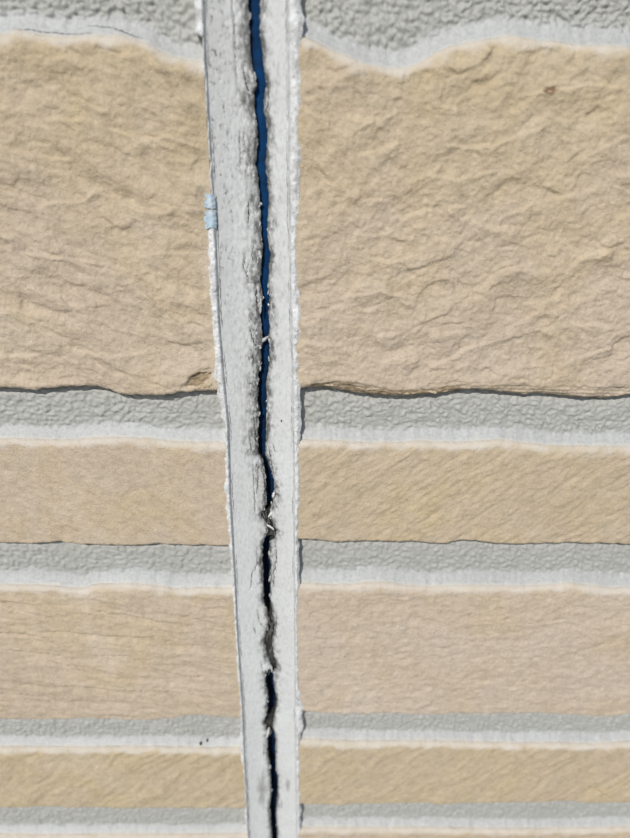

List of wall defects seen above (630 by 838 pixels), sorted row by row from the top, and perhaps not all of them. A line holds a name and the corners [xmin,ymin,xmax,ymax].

crack [215,214,223,322]
crack [232,0,294,838]